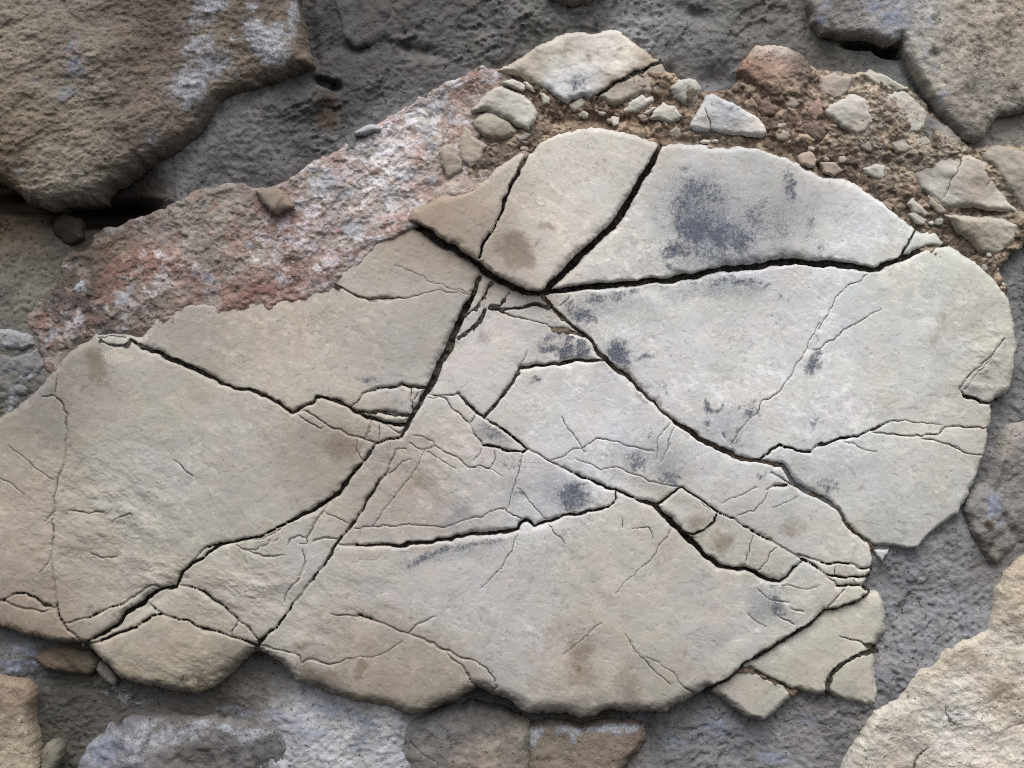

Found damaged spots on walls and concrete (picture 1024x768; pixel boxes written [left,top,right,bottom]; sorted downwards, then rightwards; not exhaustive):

crack [0,109,1017,721]